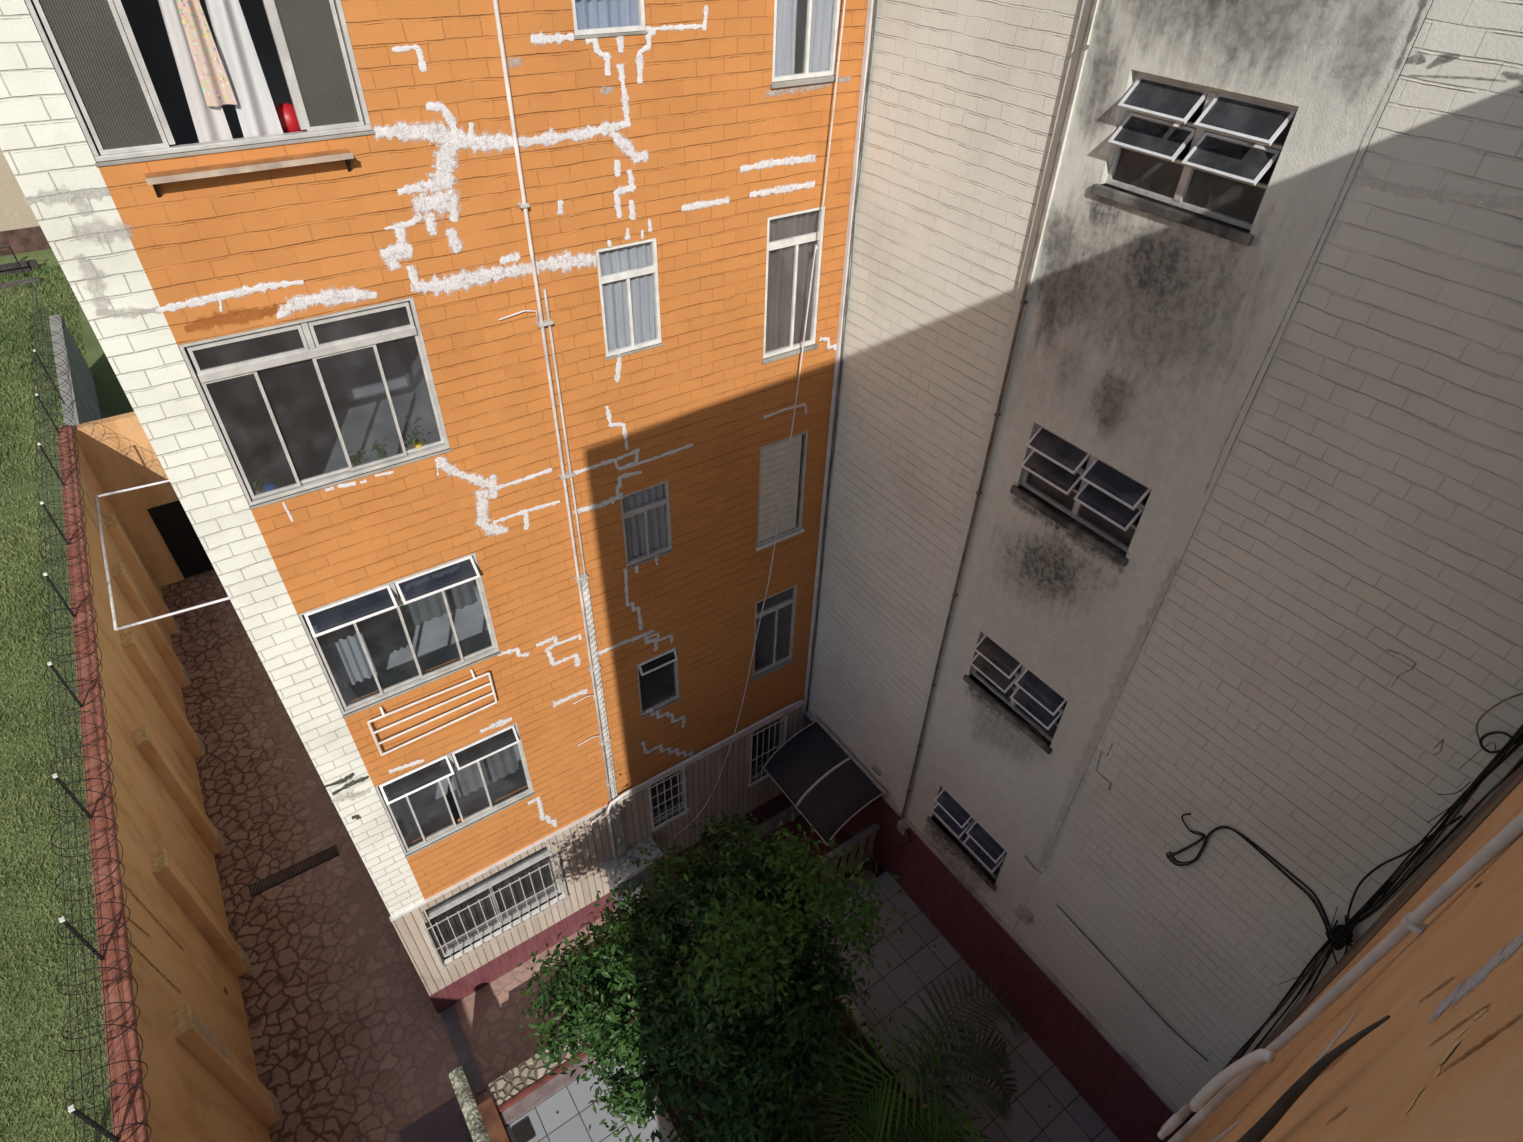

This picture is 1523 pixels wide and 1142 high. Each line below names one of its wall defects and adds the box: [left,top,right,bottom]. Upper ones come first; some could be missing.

crack [155,5,816,319]
crack [435,354,693,535]
crack [498,555,673,707]
crack [480,717,512,733]
crack [641,708,693,757]